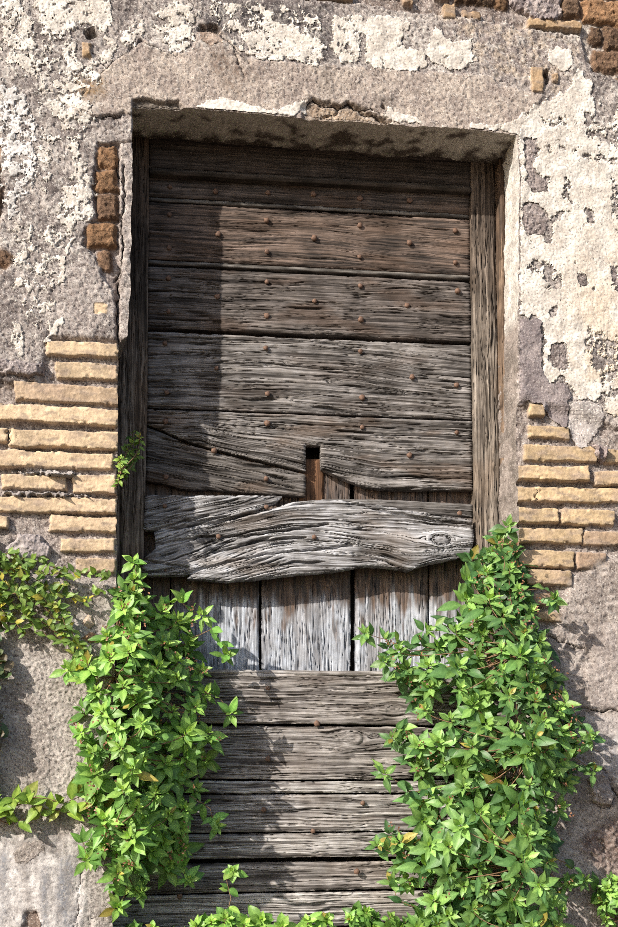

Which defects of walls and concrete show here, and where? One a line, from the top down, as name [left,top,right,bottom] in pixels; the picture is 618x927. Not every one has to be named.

flaking render [0,0,475,357]
flaking render [470,46,618,449]